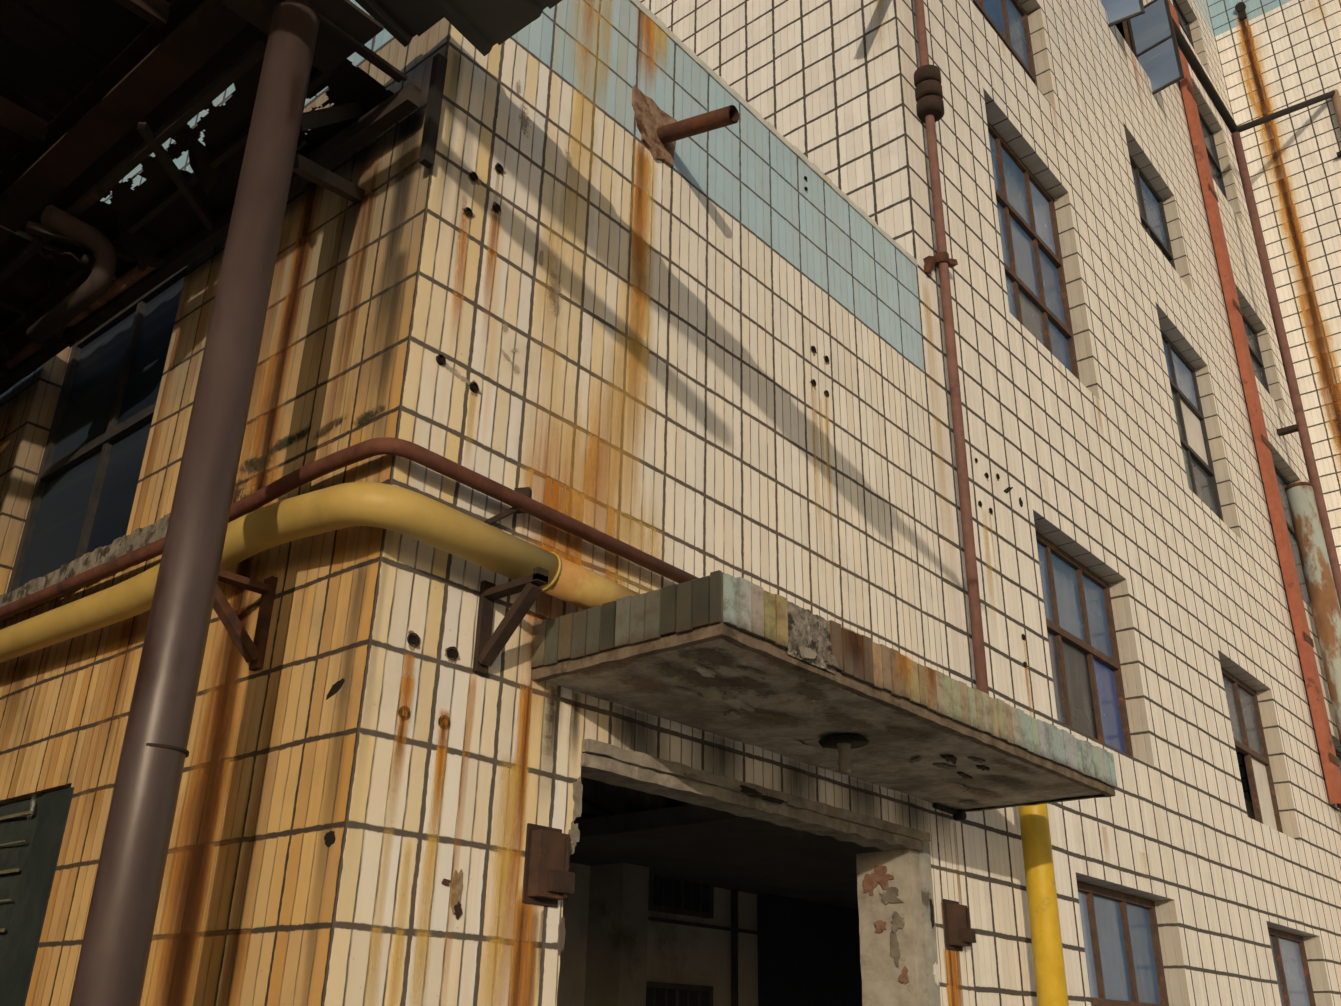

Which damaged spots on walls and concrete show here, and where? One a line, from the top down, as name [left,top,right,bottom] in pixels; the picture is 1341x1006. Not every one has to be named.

corrosion [639,11,665,70]
corrosion [630,147,649,372]
corrosion [1239,18,1341,446]
spalling [787,601,838,674]
spalling [441,869,463,920]
peeling [863,866,909,984]
corrosion [945,949,961,1006]